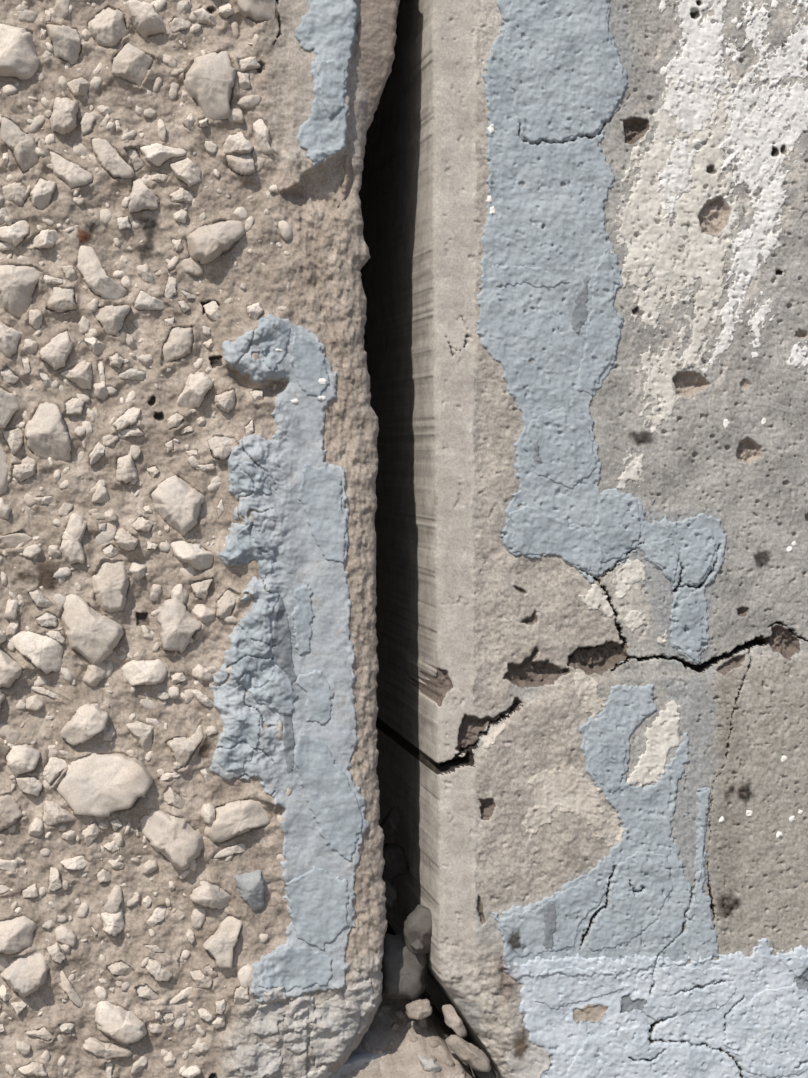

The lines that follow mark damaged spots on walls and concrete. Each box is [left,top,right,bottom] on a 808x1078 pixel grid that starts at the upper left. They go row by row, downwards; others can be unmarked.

peeling [294,0,358,168]
leakage [631,431,652,444]
peeling [476,0,808,664]
peeling [209,314,376,1078]
peeling [481,723,506,749]
crack [376,543,808,957]
peeling [492,672,808,1078]
crack [629,998,743,1078]